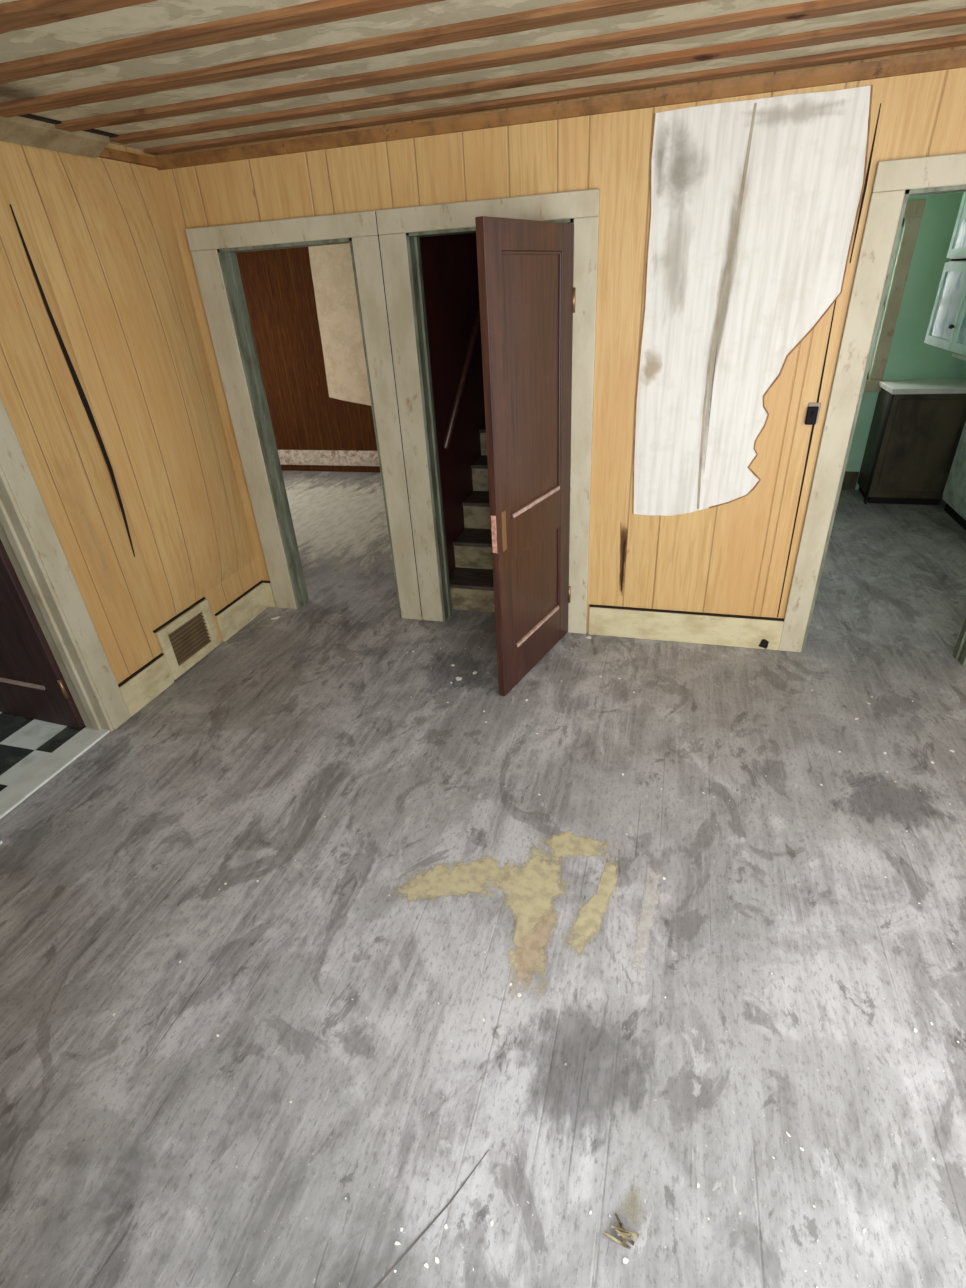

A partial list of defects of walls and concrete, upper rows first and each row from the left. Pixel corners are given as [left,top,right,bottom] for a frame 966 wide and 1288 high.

crack [9,204,135,557]
peeling [632,85,873,516]